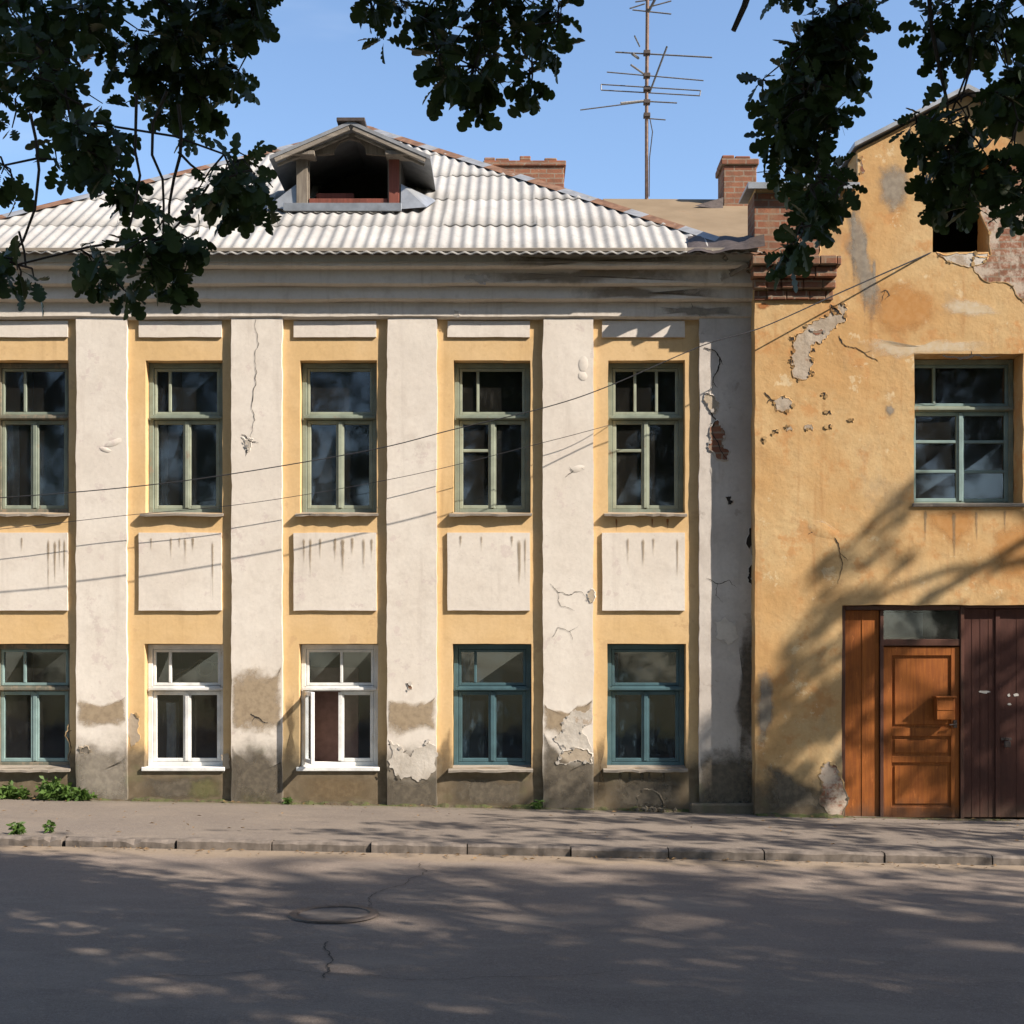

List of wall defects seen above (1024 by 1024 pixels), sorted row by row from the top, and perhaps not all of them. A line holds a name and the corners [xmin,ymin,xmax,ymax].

damp [849,212,973,356]
flaking render [937,203,1024,304]
crack [242,321,259,454]
crack [704,347,727,459]
flaking render [703,392,731,462]
spalling [788,302,848,381]
crack [839,337,878,362]
crack [809,532,848,584]
damp [78,700,125,725]
damp [77,745,126,798]
damp [232,670,294,801]
peeling [387,739,438,782]